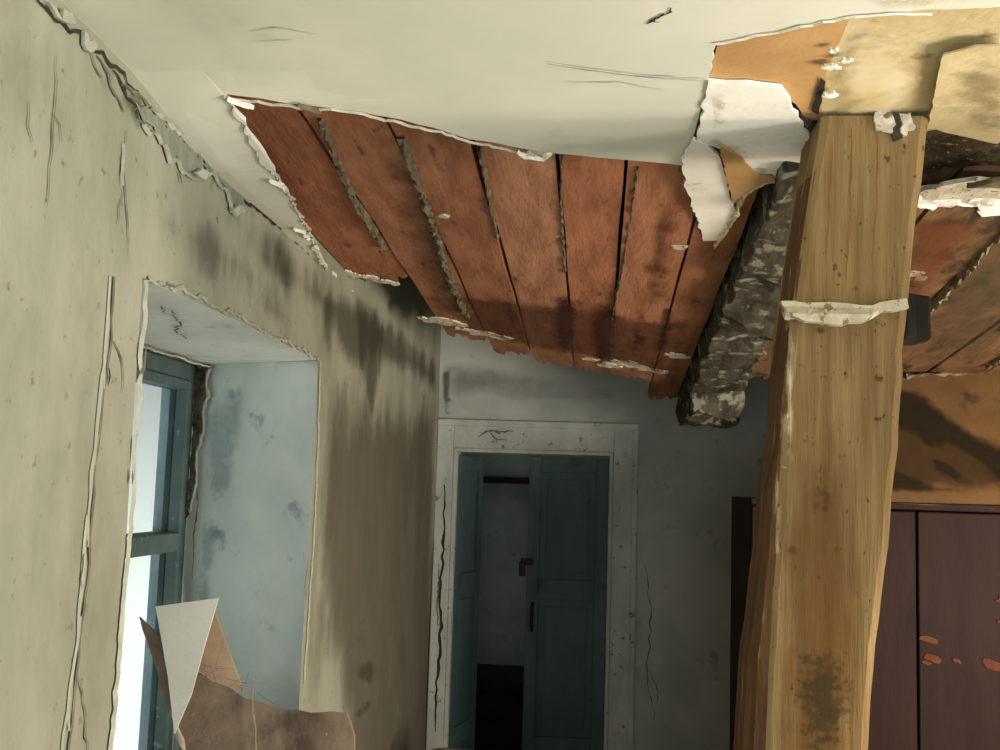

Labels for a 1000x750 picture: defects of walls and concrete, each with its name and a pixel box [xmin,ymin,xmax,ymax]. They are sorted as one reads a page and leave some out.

crack [38,0,215,252]
peeling [224,95,553,270]
spalling [917,176,1000,217]
crack [244,199,315,260]
damp [327,306,450,403]
peeling [417,316,514,341]
damp [555,298,576,349]
damp [594,306,616,360]
peeling [582,357,668,374]
damp [657,310,672,351]
crack [61,276,124,750]
crack [435,485,446,732]